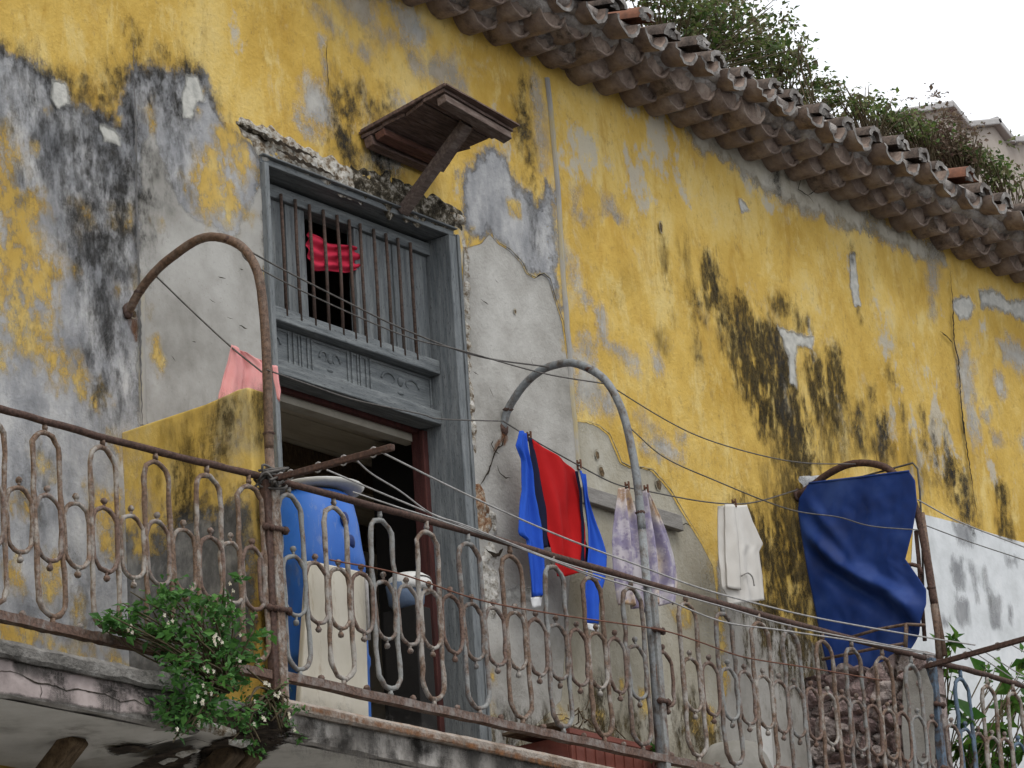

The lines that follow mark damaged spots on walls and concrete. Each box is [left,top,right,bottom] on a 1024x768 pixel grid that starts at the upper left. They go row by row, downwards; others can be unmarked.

leakage [62,110,152,274]
peeling [685,126,948,290]
peeling [0,45,567,679]
peeling [564,277,639,412]
peeling [778,327,814,388]
peeling [849,252,861,307]
crack [940,276,978,518]
peeling [953,288,1024,321]
leakage [693,252,863,699]
leakage [923,434,972,544]
leakage [995,483,1015,540]
leakage [943,559,1012,627]